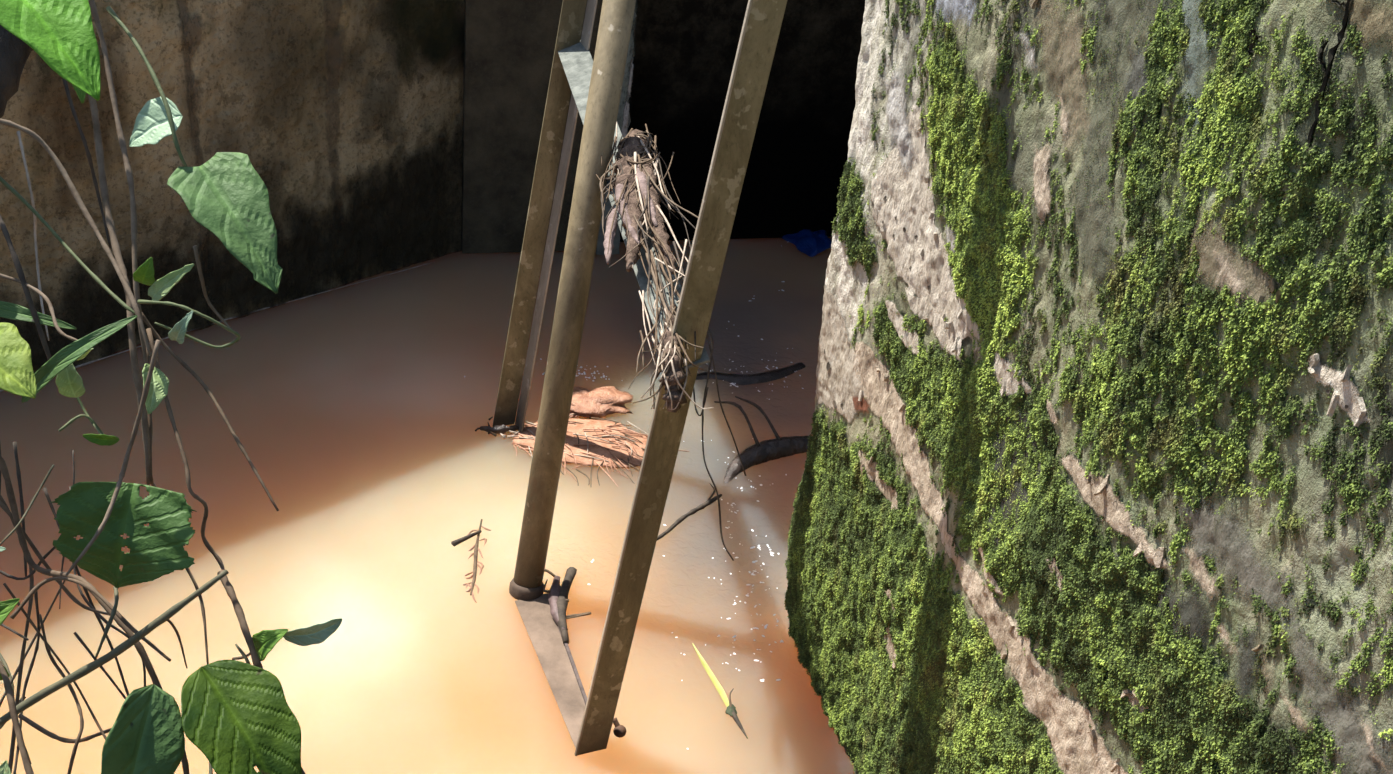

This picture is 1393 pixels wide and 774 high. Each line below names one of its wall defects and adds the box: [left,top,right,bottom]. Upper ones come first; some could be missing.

crack [1308,0,1351,147]
peeling [1349,0,1393,48]
leakage [0,0,463,373]
spalling [871,104,1058,424]
peeling [1192,225,1281,315]
spalling [1308,353,1370,427]
peeling [816,285,1128,774]
peeling [1061,455,1167,568]
peeling [1120,688,1148,713]